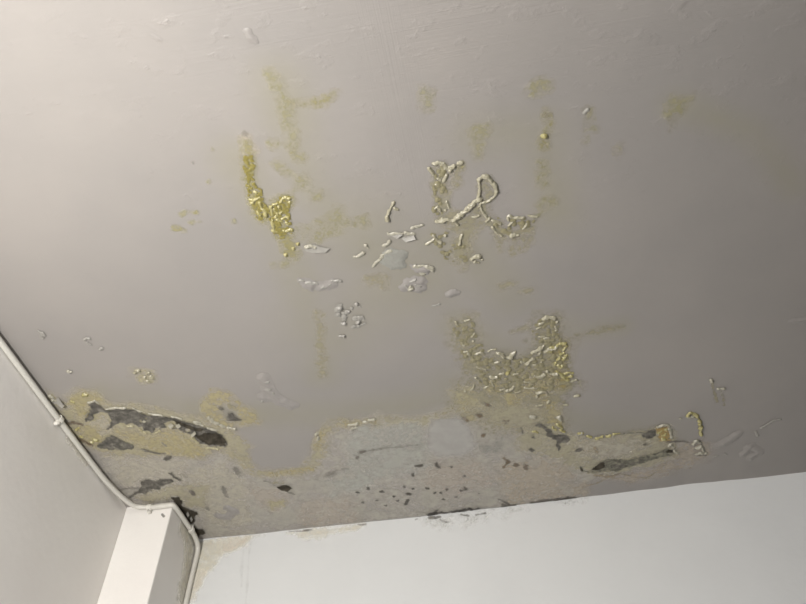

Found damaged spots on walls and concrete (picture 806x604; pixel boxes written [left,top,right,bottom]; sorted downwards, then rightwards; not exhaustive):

peeling [372,224,424,270]
spalling [48,393,242,461]
water stain [59,312,621,601]
spalling [529,423,570,452]
spalling [580,429,675,478]
spalling [121,472,181,498]
spalling [171,497,205,538]